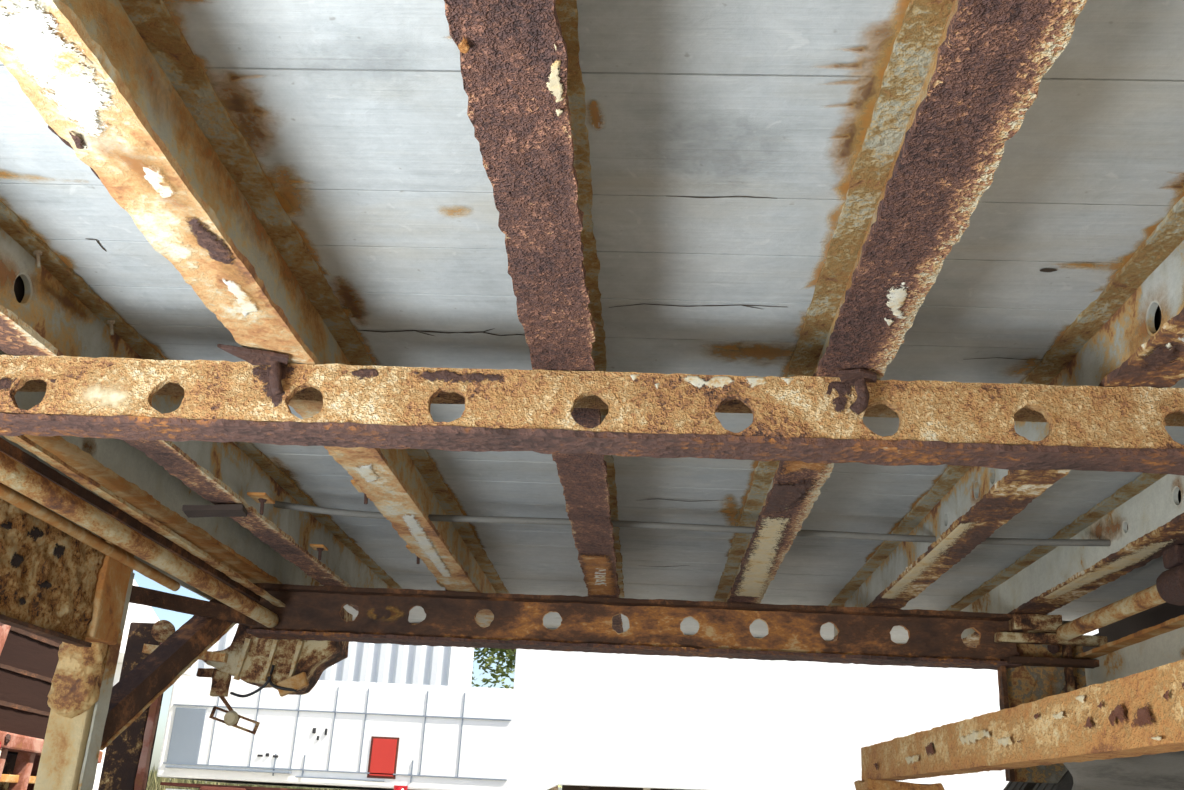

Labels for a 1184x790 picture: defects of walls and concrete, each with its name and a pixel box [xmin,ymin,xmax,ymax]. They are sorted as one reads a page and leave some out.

peeling [0,0,114,138]
rust [807,0,910,303]
rust [99,149,189,216]
peeling [143,165,177,198]
rust [194,55,378,366]
crack [670,193,777,201]
peeling [223,278,259,316]
crack [609,302,777,310]
peeling [884,282,909,326]
crack [360,328,525,336]
rust [251,365,295,407]
rust [826,381,854,413]